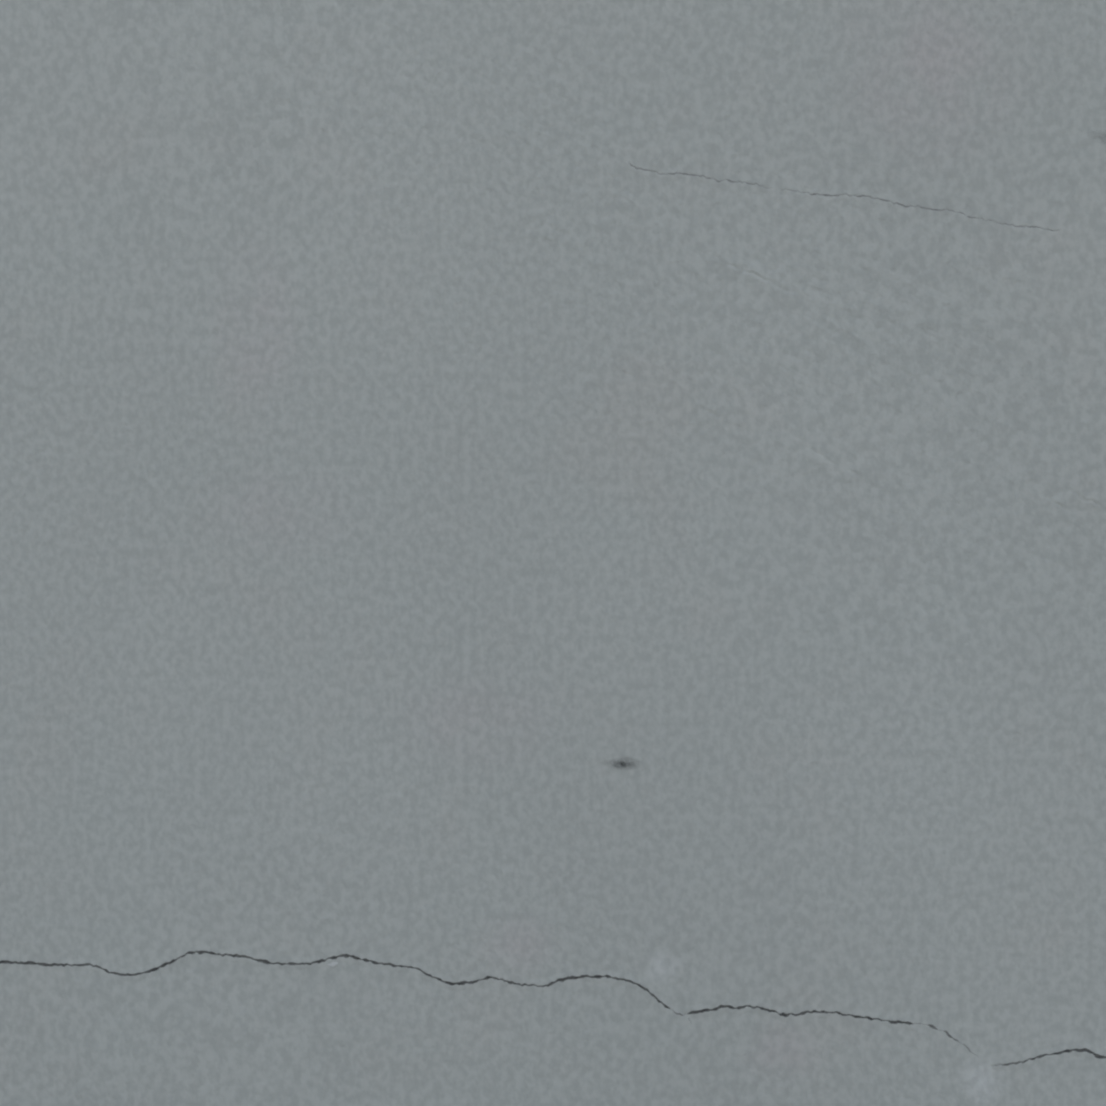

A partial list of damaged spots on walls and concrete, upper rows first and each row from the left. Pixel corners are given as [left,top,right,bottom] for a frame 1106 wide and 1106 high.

crack [0,945,1106,1071]